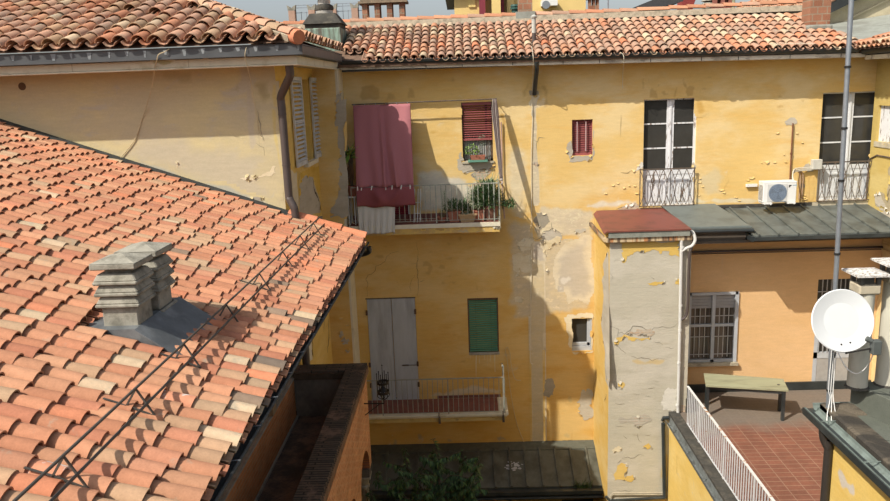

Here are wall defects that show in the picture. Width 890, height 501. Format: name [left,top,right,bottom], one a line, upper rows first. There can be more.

peeling [87,124,281,208]
peeling [290,91,349,219]
peeling [565,131,595,163]
peeling [874,166,890,218]
peeling [412,137,655,385]
flaking render [577,388,594,420]